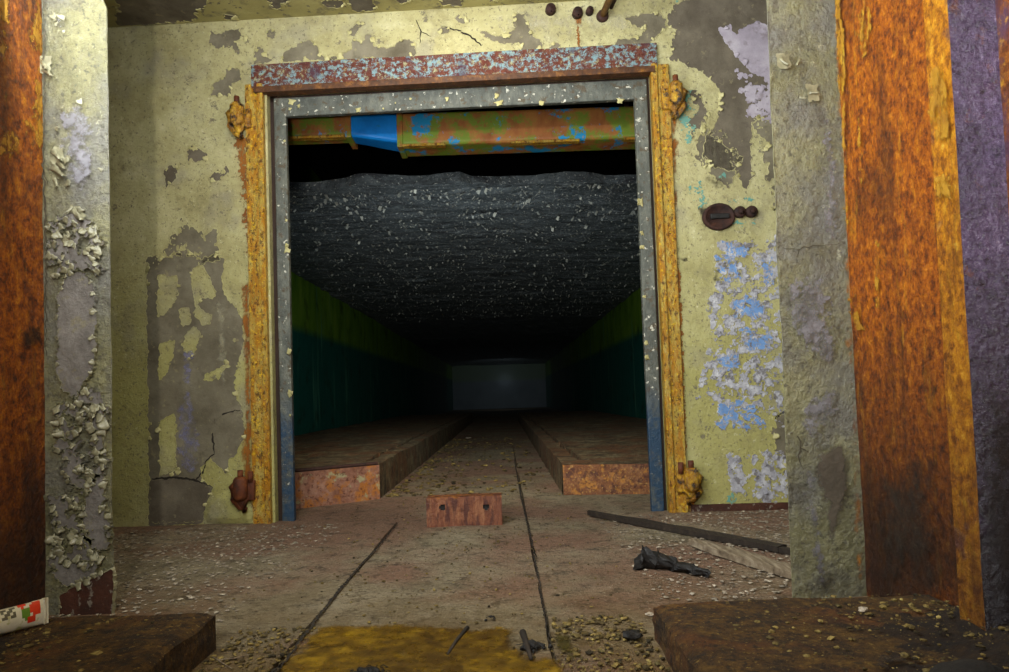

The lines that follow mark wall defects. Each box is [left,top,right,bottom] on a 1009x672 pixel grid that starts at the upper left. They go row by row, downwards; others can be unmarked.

rust [0,0,45,158]
peeling [49,98,103,195]
peeling [113,0,208,27]
rust [234,138,248,253]
peeling [614,0,802,210]
rust [835,0,871,183]
rust [928,66,949,140]
peeling [42,205,118,617]
peeling [145,217,246,526]
rust [242,284,252,479]
rust [678,258,687,448]
peeling [600,235,838,603]